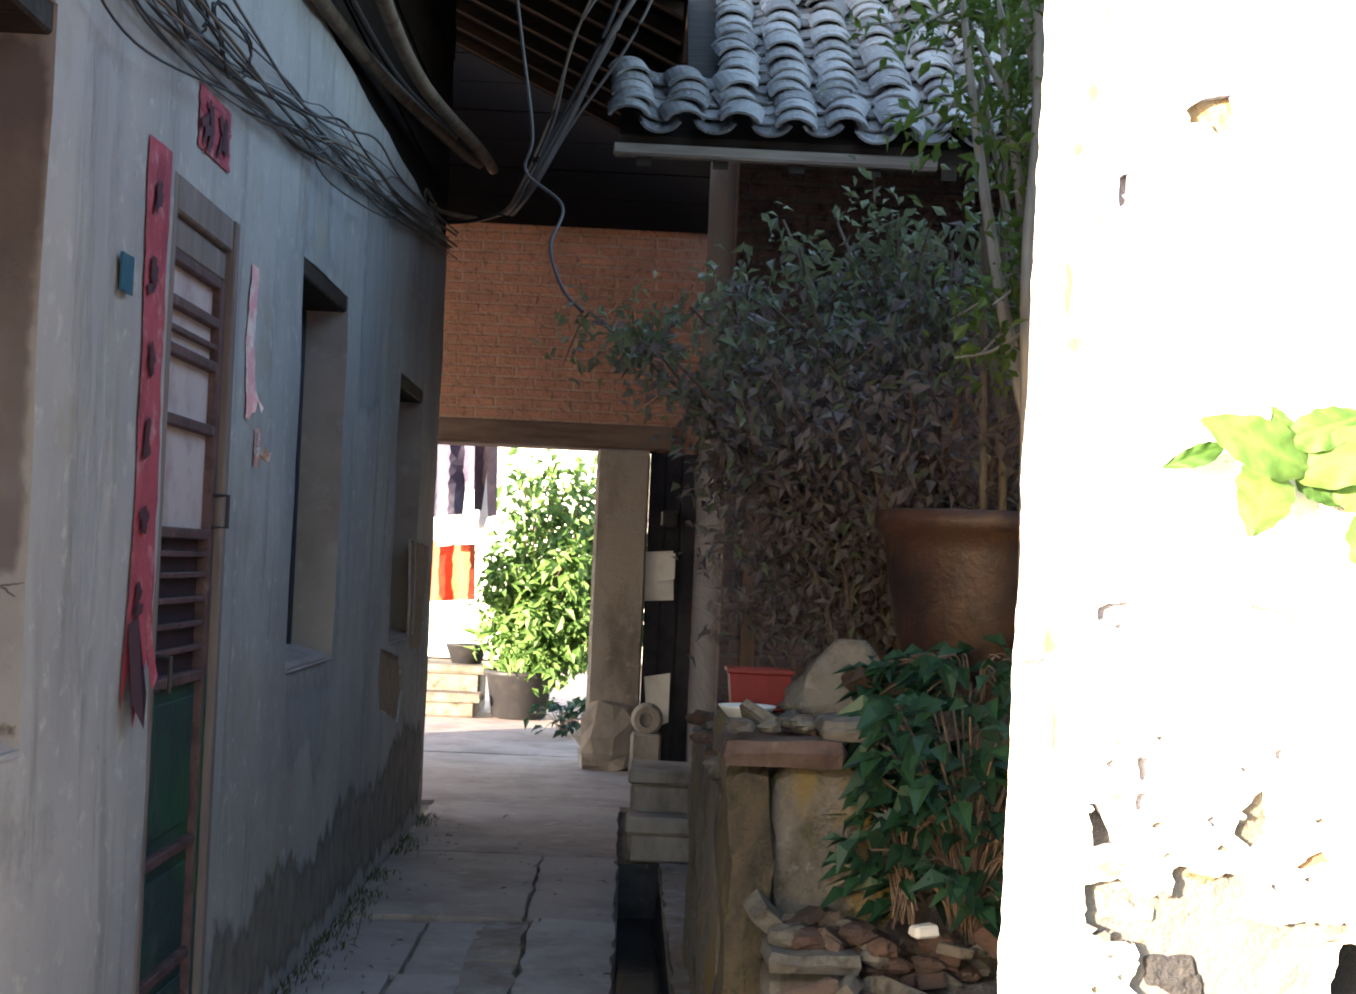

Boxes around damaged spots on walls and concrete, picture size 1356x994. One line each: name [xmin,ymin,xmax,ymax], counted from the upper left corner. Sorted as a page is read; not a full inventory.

flaking render [1186,94,1240,134]
crack [0,582,24,597]
flaking render [1135,736,1169,812]
leakage [208,722,421,994]
flaking render [1080,803,1118,850]
flaking render [1207,790,1270,853]
flaking render [1081,851,1350,994]